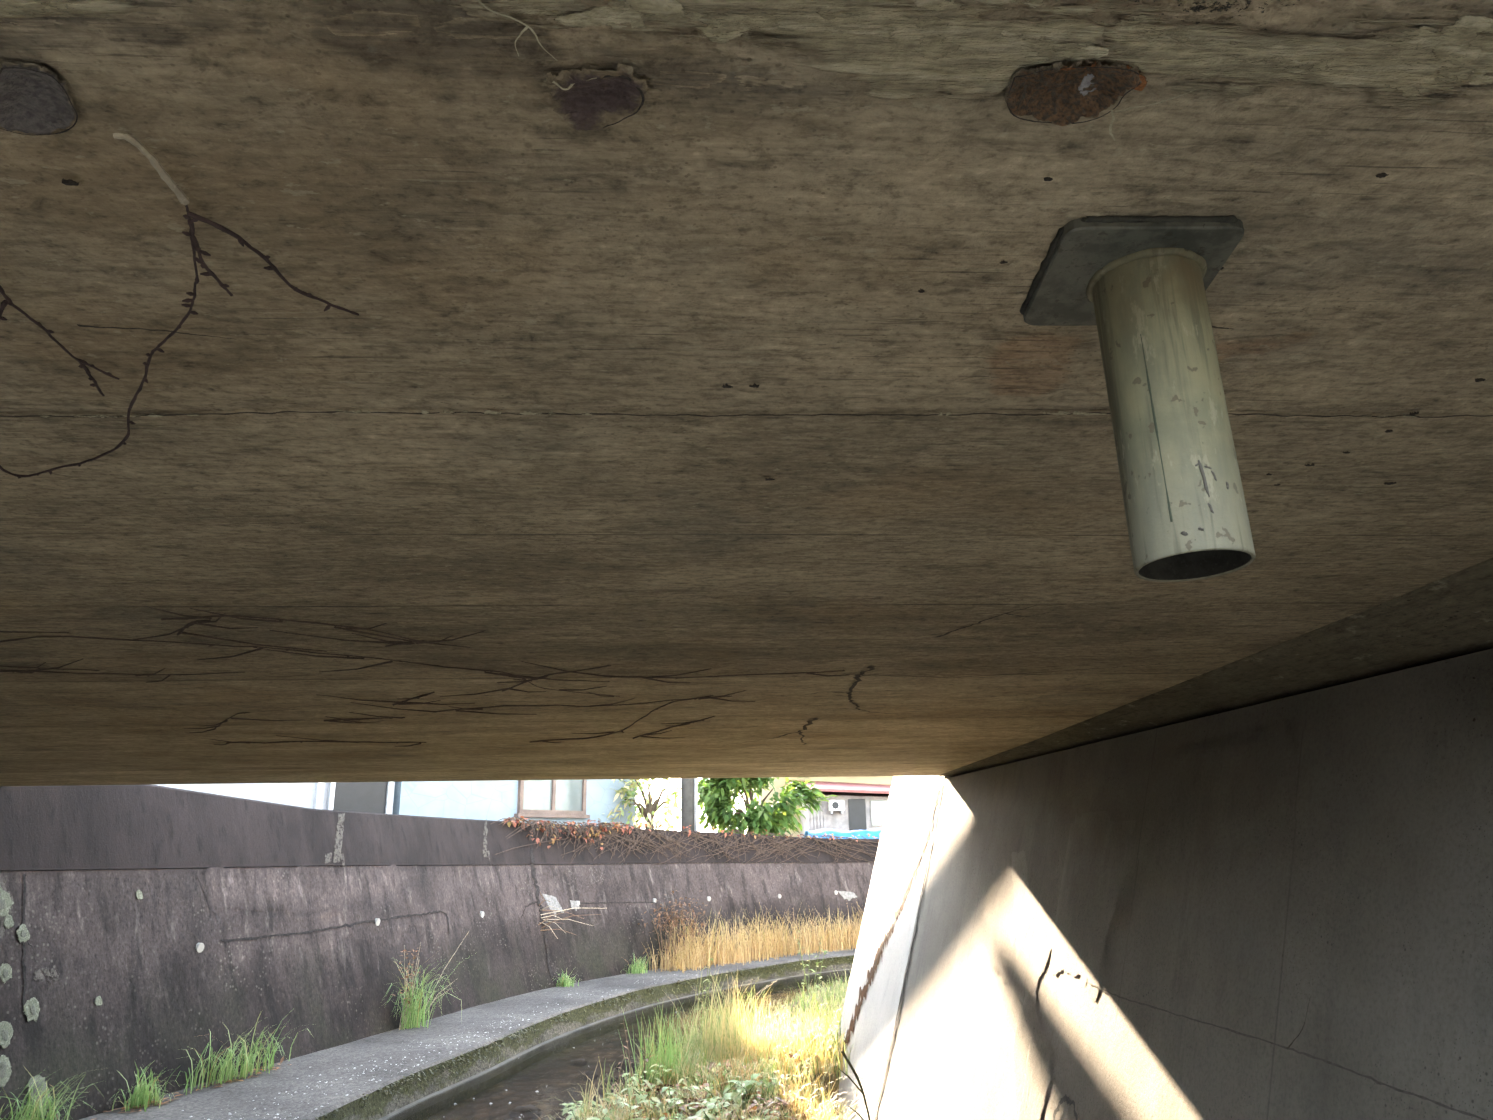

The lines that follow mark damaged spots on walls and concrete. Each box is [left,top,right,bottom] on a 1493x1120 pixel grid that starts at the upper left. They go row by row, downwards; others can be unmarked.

spalling [0,61,78,135]
peeling [0,0,143,29]
leakage [0,3,272,67]
leakage [295,0,864,114]
peeling [447,0,1493,141]
mould [1114,0,1300,32]
crack [77,324,232,339]
crack [727,661,1200,745]
crack [1088,982,1486,1120]